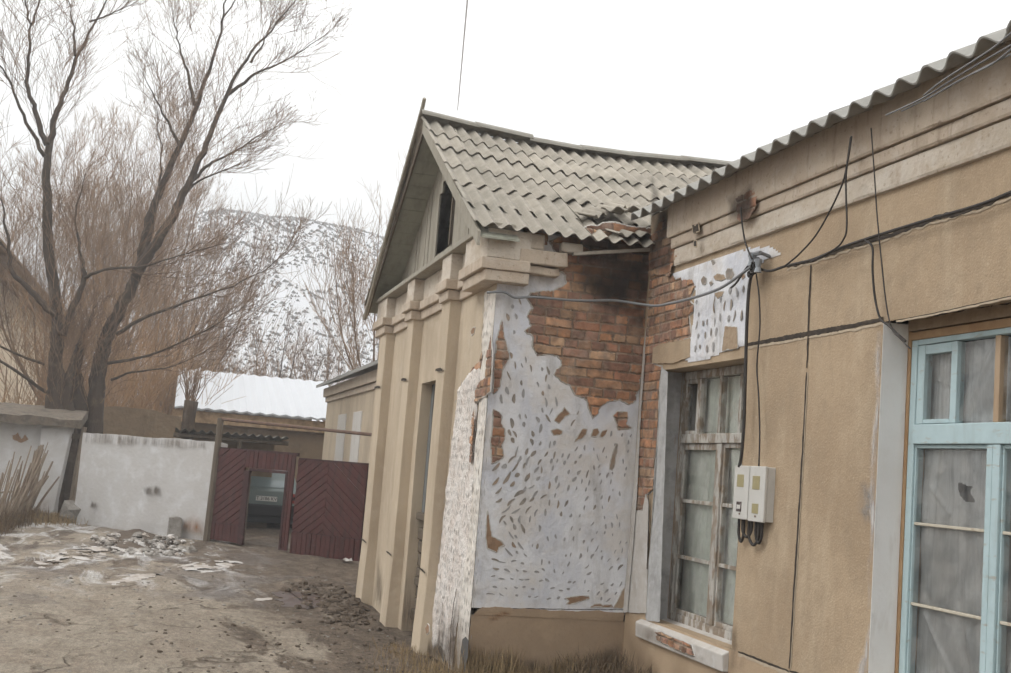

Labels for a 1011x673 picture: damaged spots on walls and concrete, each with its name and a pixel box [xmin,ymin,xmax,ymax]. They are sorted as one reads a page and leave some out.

flaking render [469,320,509,464]
flaking render [523,217,746,510]
flaking render [485,510,505,553]
flaking render [655,631,695,657]